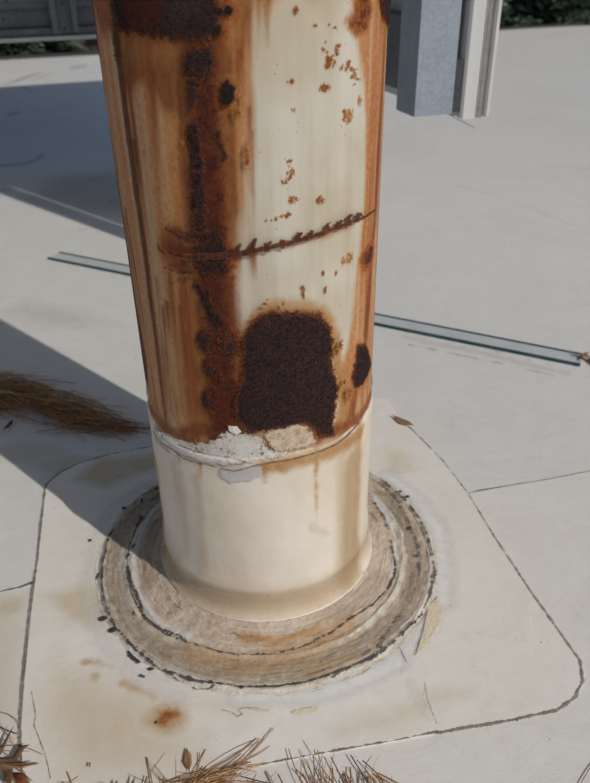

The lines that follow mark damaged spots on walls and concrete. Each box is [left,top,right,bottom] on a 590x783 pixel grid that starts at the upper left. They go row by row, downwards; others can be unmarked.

rust [91,0,391,474]
peeling [153,424,316,484]
rust [154,711,180,727]